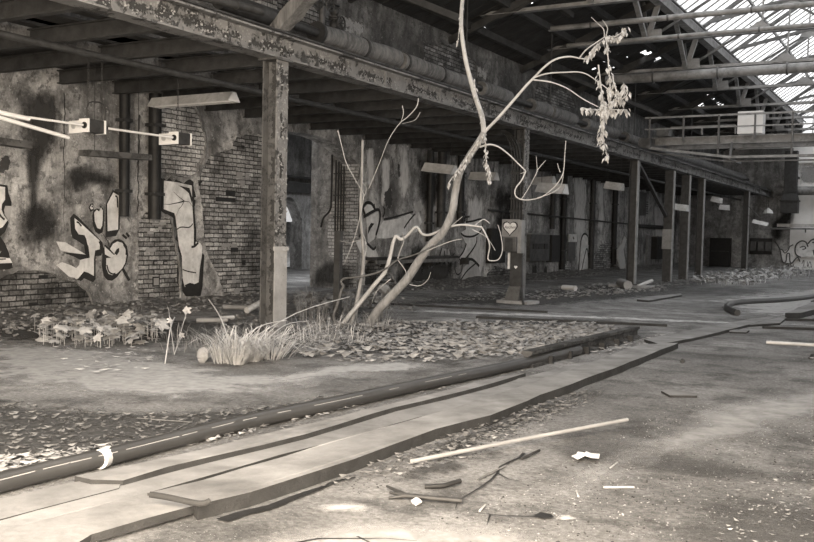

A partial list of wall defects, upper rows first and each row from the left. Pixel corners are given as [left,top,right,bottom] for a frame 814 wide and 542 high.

peeling [124,0,251,47]
flaking render [418,37,487,80]
peeling [0,155,10,173]
peeling [76,136,106,168]
flaking render [161,3,363,318]
peeling [306,49,620,219]
flaking render [327,163,396,289]
flaking render [0,205,185,311]
flaking render [594,240,617,269]